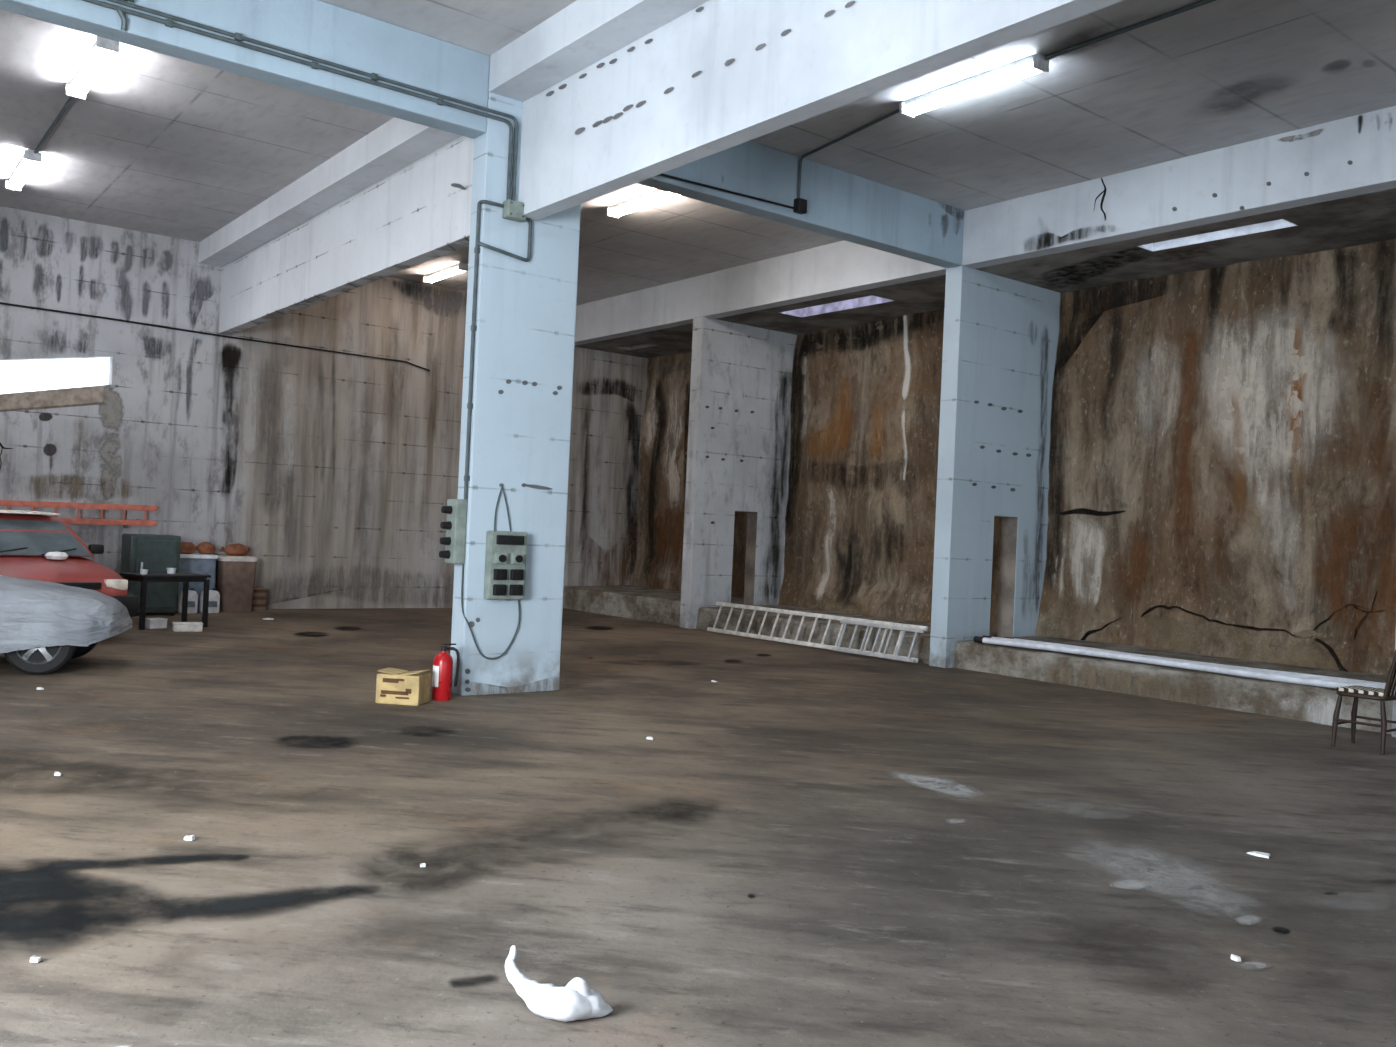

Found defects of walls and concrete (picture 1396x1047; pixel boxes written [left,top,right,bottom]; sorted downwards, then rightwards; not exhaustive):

crack [1094,178,1106,220]
leakage [0,219,61,301]
leakage [67,233,172,321]
leakage [51,332,87,353]
leakage [143,337,170,358]
leakage [179,279,212,411]
corrosion [1291,328,1304,443]
leakage [222,345,295,551]
leakage [582,379,691,573]
crack [1060,508,1125,516]
corrosion [1175,336,1198,541]
crack [1081,591,1384,672]